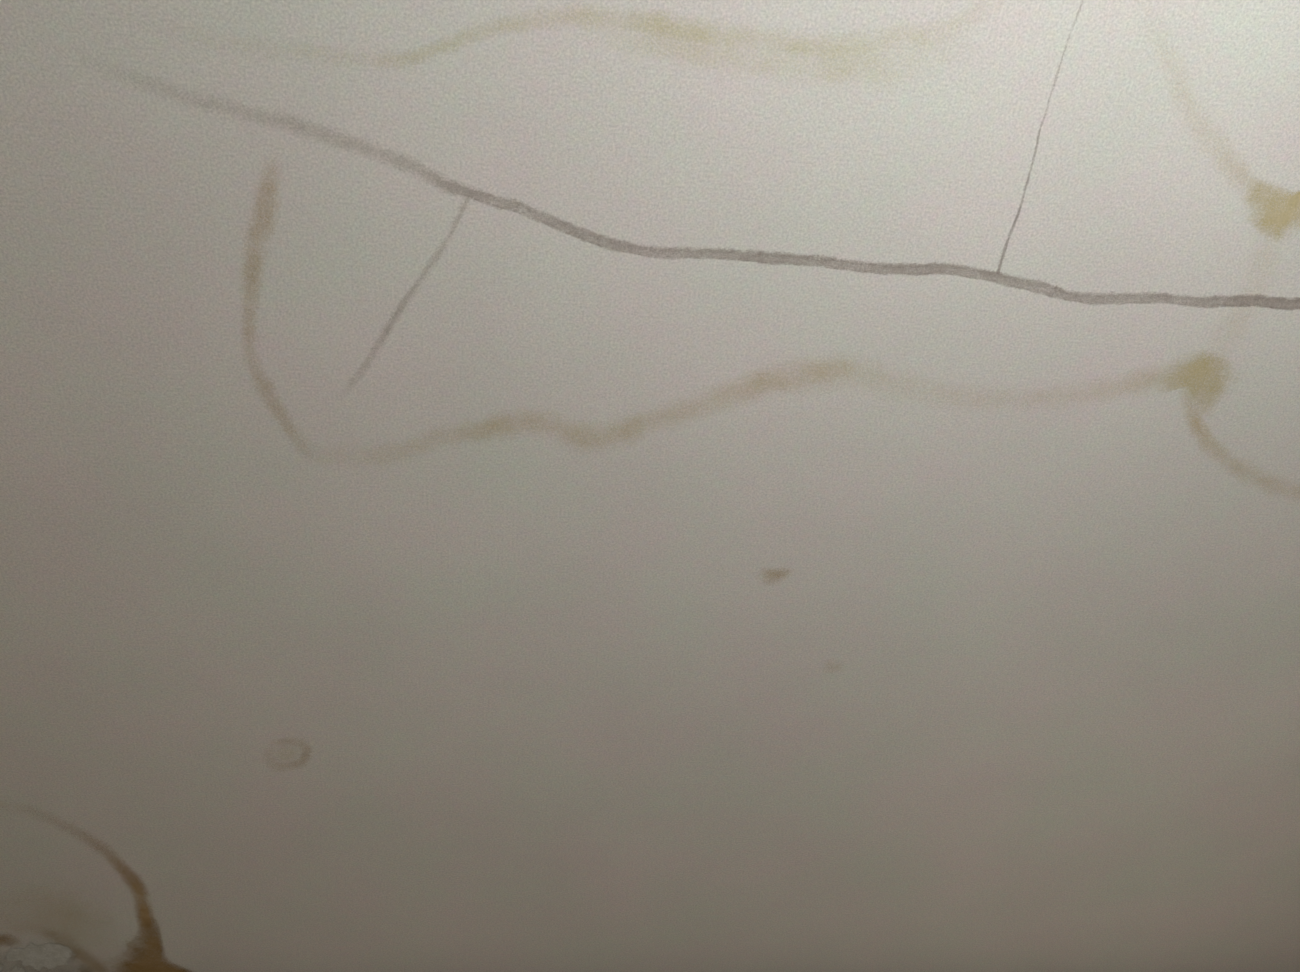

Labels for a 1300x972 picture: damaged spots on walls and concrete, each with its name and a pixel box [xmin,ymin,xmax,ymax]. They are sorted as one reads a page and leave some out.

crack [79,0,1300,397]
damp [239,3,1300,504]